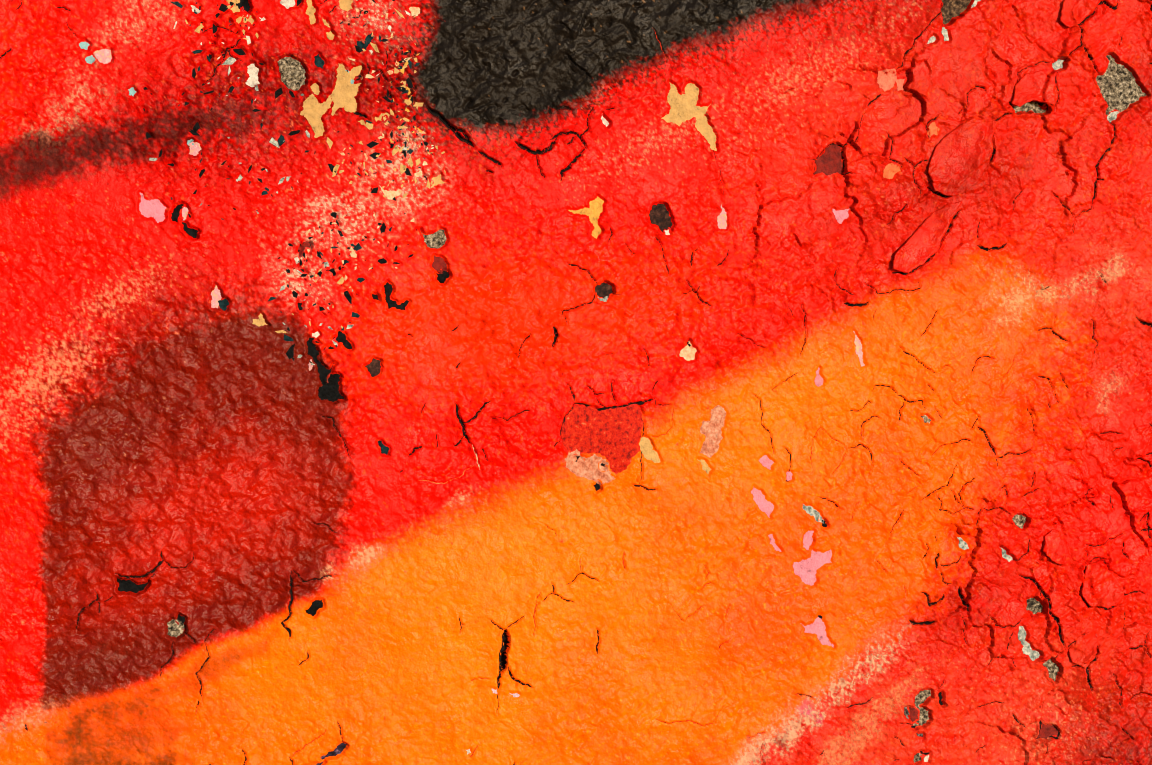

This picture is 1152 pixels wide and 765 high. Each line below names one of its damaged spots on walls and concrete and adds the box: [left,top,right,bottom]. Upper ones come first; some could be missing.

peeling [139,122,210,238]
peeling [171,0,265,128]
peeling [269,0,502,283]
crack [515,12,614,181]
peeling [661,82,717,151]
spalling [1096,55,1146,122]
peeling [252,212,414,402]
crack [755,1,1152,764]
peeling [793,504,832,586]
crack [281,570,332,666]
crack [459,558,598,716]
crack [289,721,343,765]